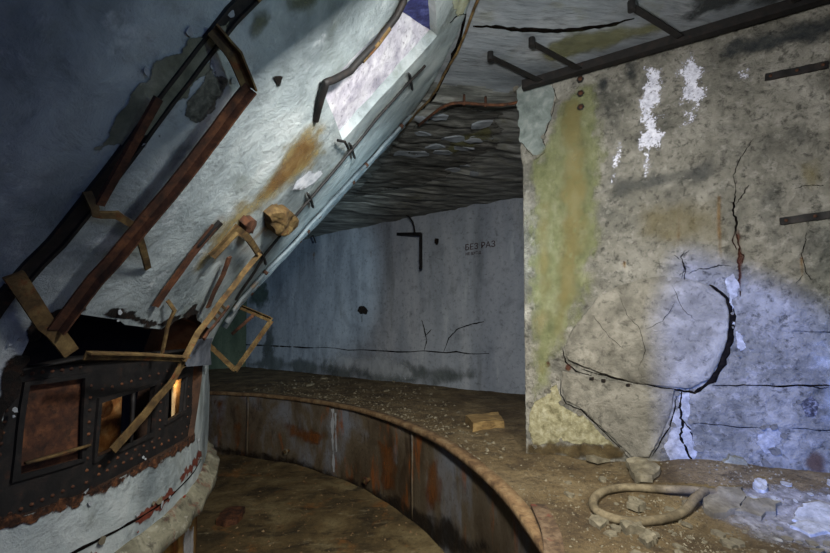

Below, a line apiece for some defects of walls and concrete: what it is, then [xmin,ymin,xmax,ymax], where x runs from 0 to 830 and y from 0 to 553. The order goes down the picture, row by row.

peeling [94,26,237,150]
spalling [351,84,559,198]
crack [421,13,634,110]
damp [675,53,707,125]
rust [152,128,323,354]
damp [530,65,667,385]
crack [676,142,751,297]
crack [246,321,489,354]
crack [583,369,758,459]
crack [713,382,830,390]